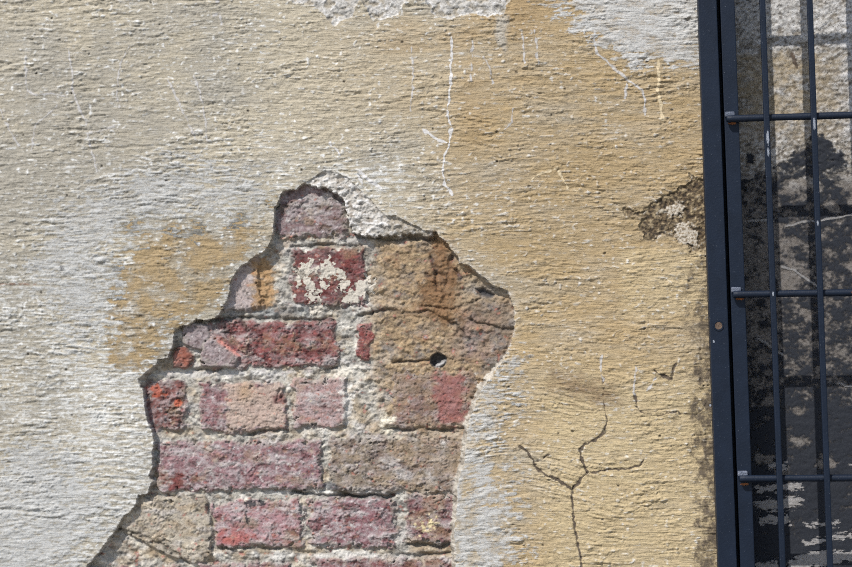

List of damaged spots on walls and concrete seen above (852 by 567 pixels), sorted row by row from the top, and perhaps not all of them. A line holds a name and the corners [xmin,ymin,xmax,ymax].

flaking render [291,0,511,27]
peeling [541,0,699,70]
flaking render [621,172,706,254]
flaking render [86,170,515,567]
crack [518,355,644,567]